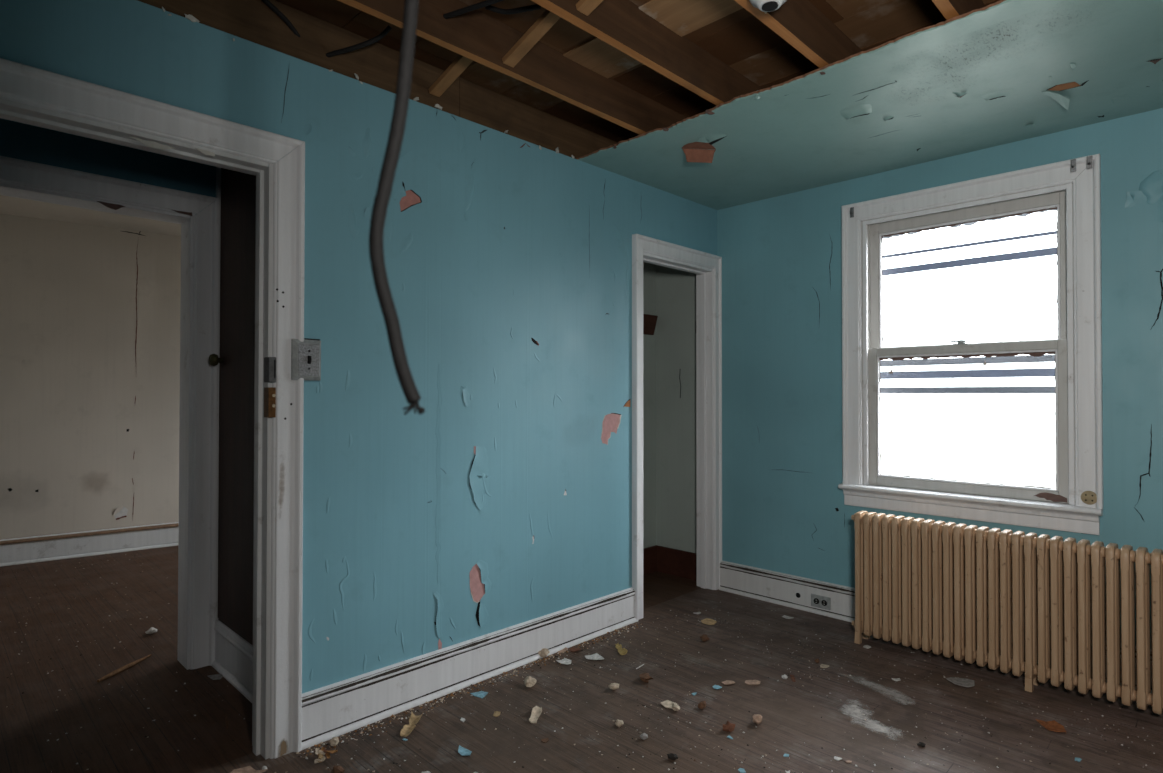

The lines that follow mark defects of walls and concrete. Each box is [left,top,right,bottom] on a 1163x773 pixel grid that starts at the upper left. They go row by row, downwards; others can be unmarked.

spalling [577,0,1005,159]
peeling [1042,91,1070,110]
peeling [400,190,422,212]
crack [1150,269,1163,330]
peeling [601,399,630,445]
crack [1134,424,1152,521]
peeling [470,560,492,603]